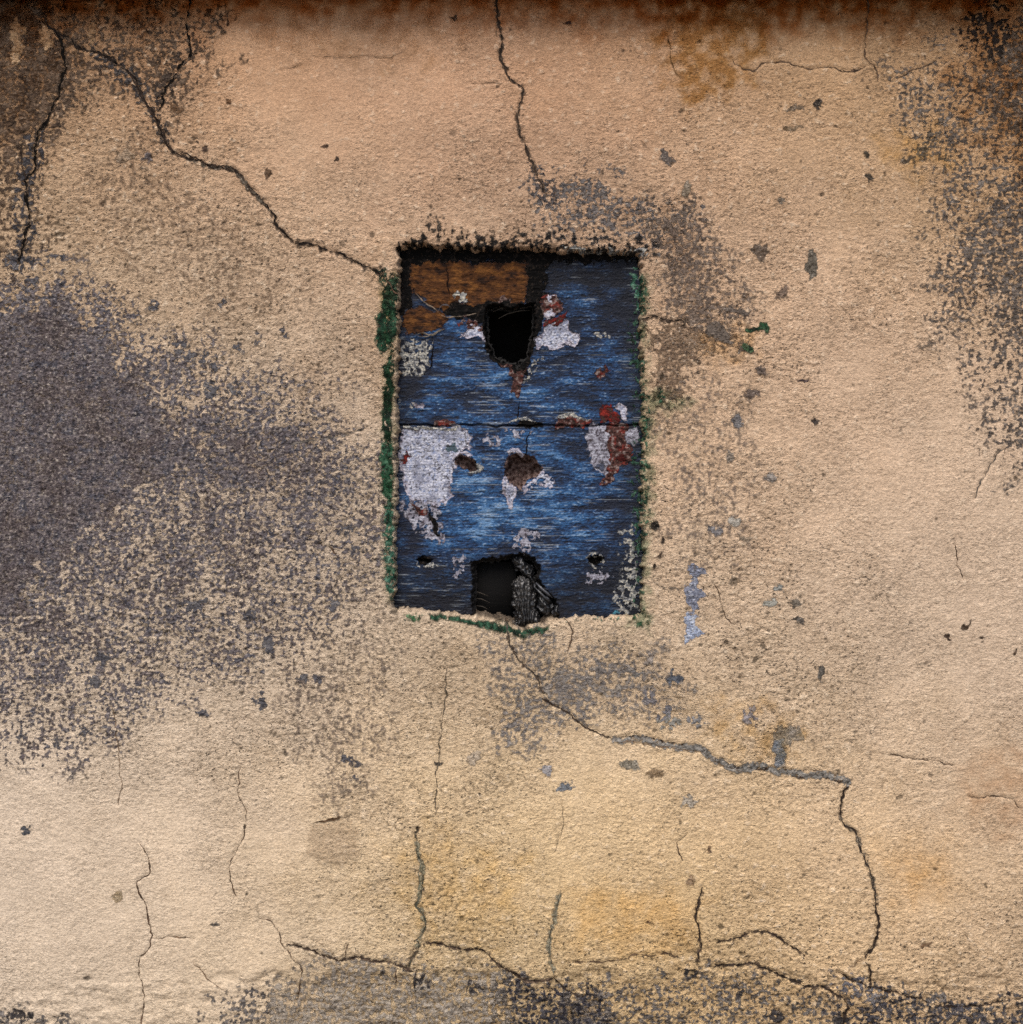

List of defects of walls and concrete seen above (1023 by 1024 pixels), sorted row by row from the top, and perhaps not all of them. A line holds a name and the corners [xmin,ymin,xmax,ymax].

crack [16,0,398,294]
crack [472,0,548,196]
water stain [953,0,1013,59]
peeling [0,142,788,803]
crack [229,766,247,895]
crack [258,618,1023,1024]
water stain [0,1001,70,1024]
crack [136,844,194,1024]
water stain [197,949,1023,1024]